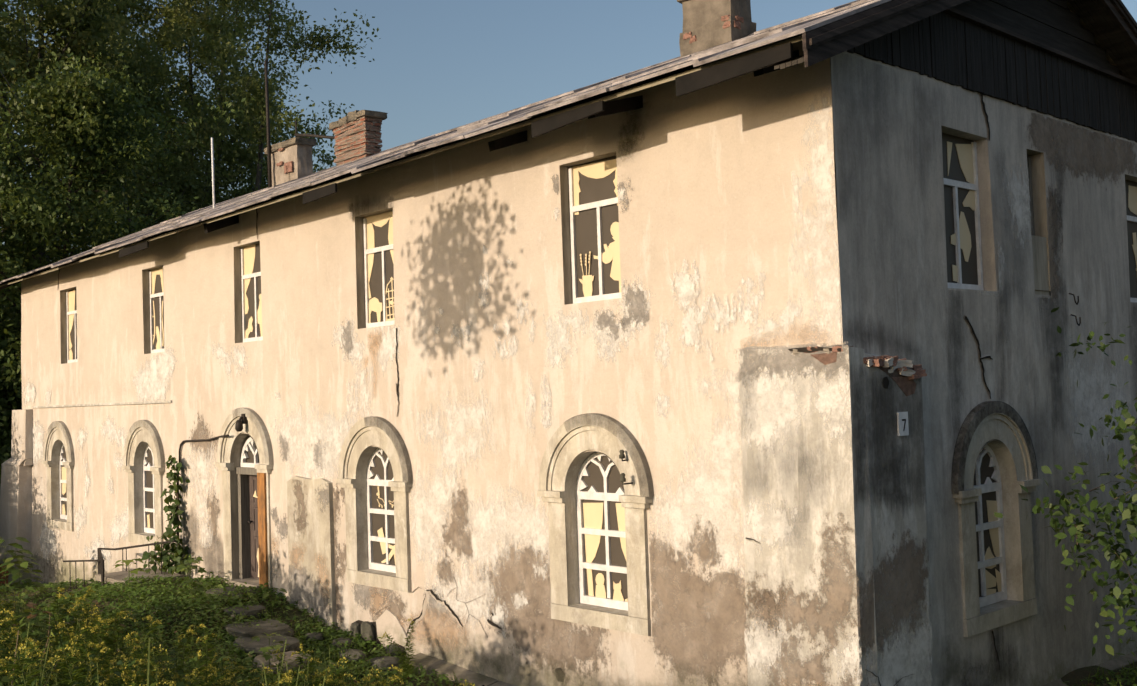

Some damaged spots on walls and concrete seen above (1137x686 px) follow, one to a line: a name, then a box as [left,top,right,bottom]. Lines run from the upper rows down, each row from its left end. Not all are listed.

crack [980,93,990,141]
crack [393,328,401,414]
flaking render [588,97,933,686]
crack [965,316,993,399]
flaking render [271,297,611,685]
crack [406,578,502,640]